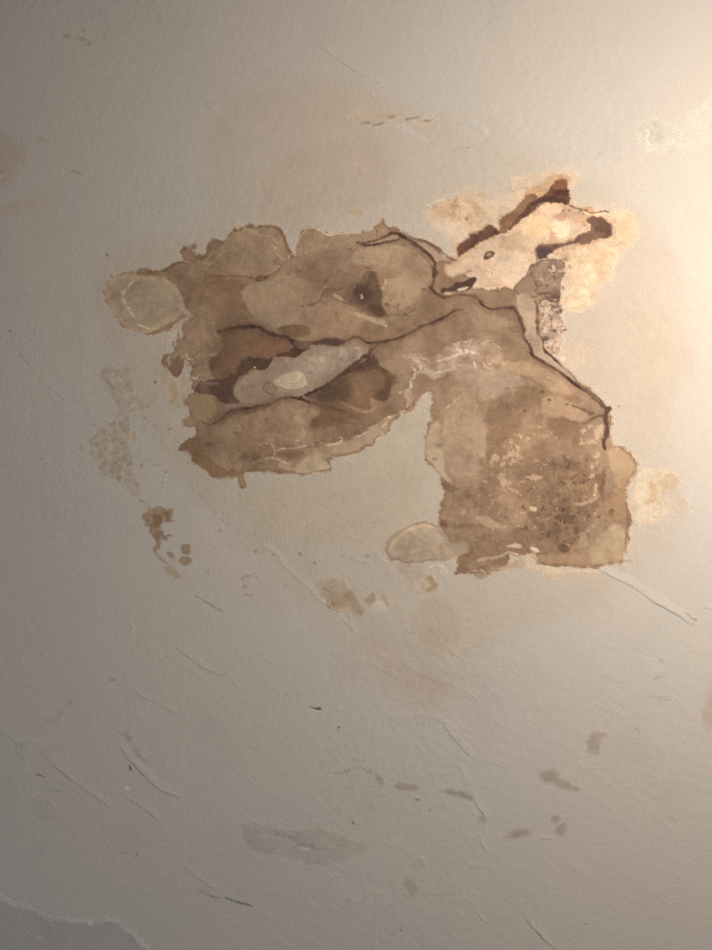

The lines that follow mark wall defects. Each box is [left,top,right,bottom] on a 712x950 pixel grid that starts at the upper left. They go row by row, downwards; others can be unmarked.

leakage [80,365,144,495]
leakage [103,218,689,593]
crack [203,232,614,450]
flaking render [538,300,566,362]